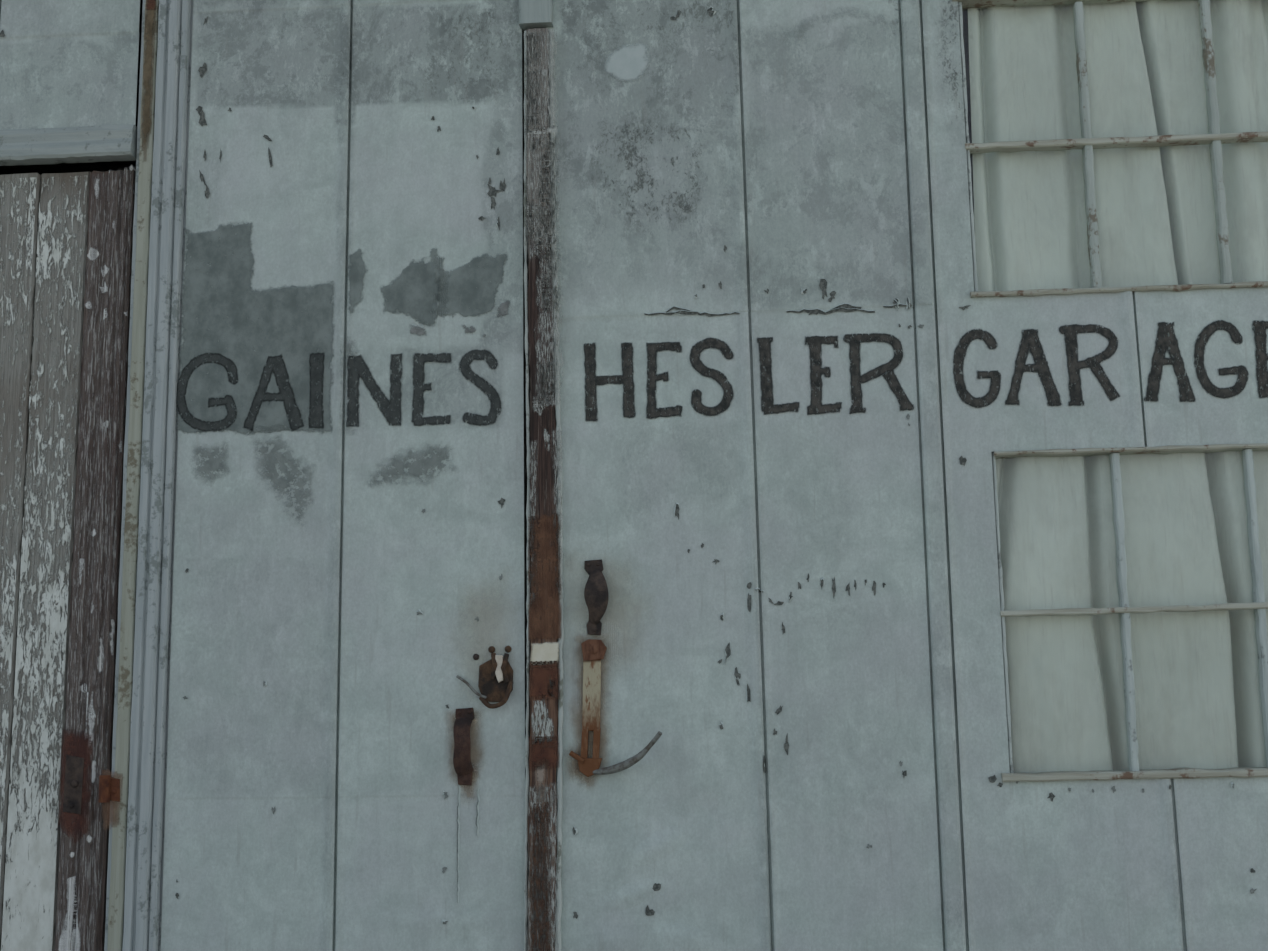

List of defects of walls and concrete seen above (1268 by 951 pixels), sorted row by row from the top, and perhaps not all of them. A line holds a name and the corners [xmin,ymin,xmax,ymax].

peeling [177,223,352,435]
peeling [348,249,366,313]
peeling [381,248,510,337]
peeling [0,165,136,951]
rust [59,732,120,840]